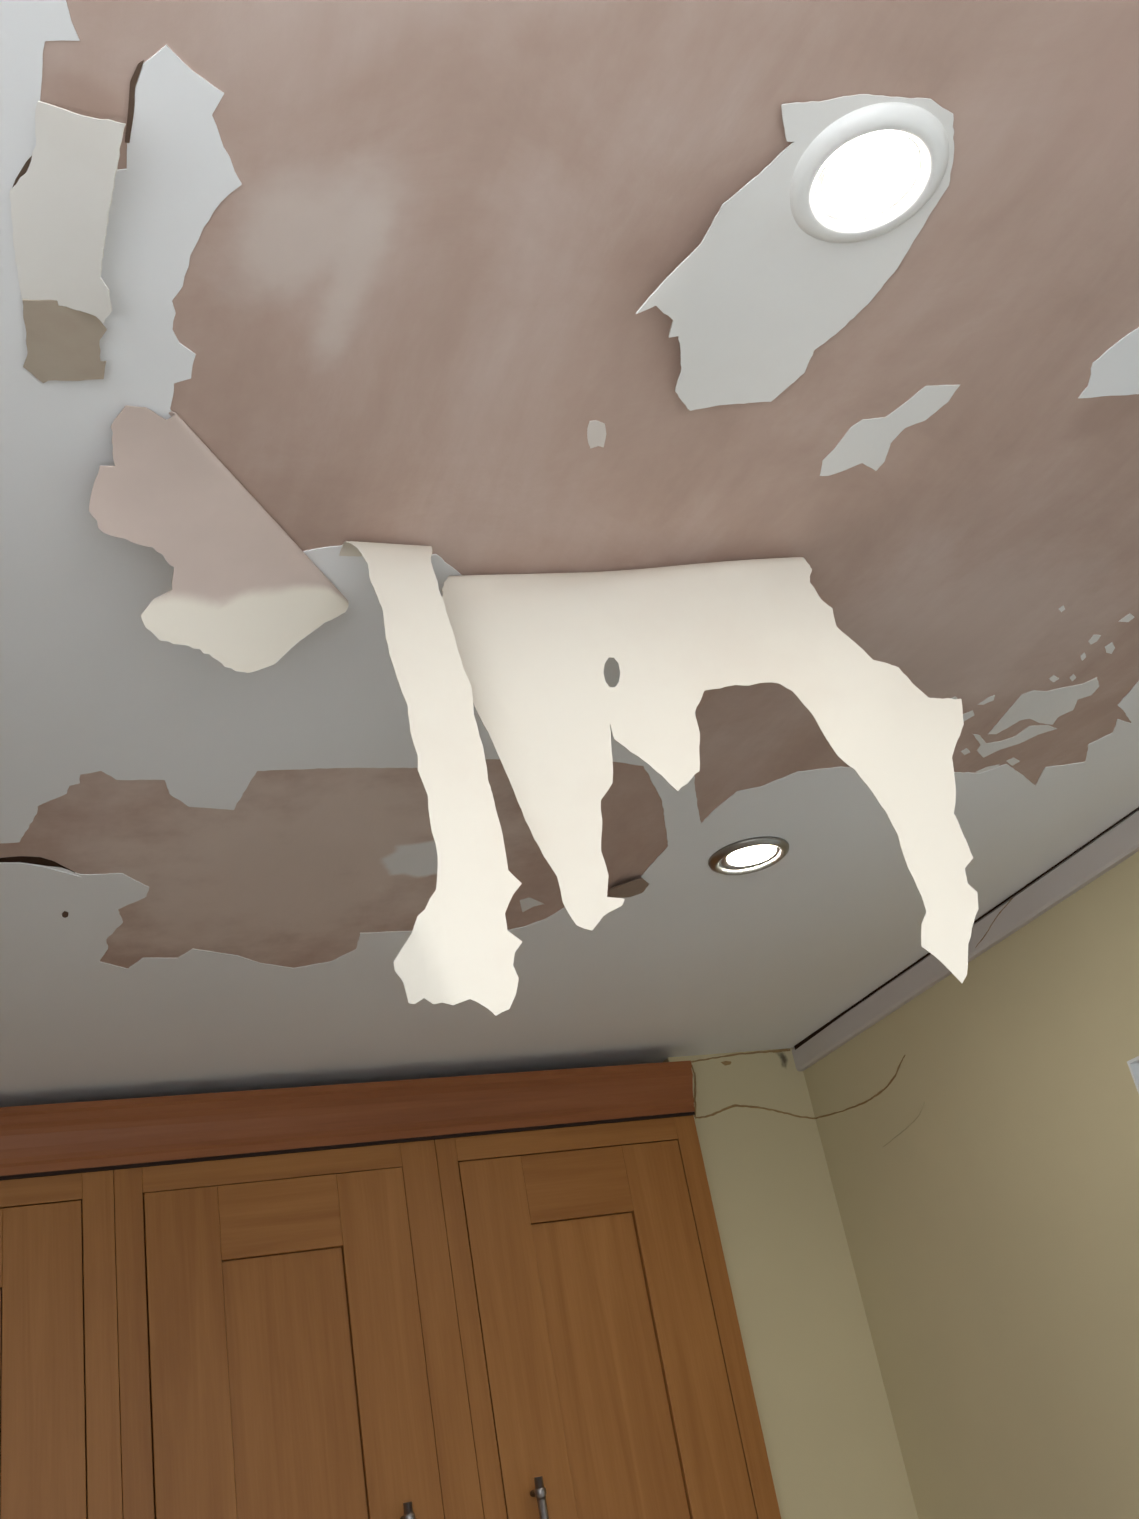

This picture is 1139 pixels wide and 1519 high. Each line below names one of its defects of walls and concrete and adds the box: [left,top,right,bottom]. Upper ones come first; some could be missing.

peeling [9,0,1139,785]
peeling [0,768,438,969]
peeling [485,759,565,930]
peeling [601,762,668,898]
peeling [694,683,849,823]
crack [973,807,1139,948]
crack [691,953,930,1119]